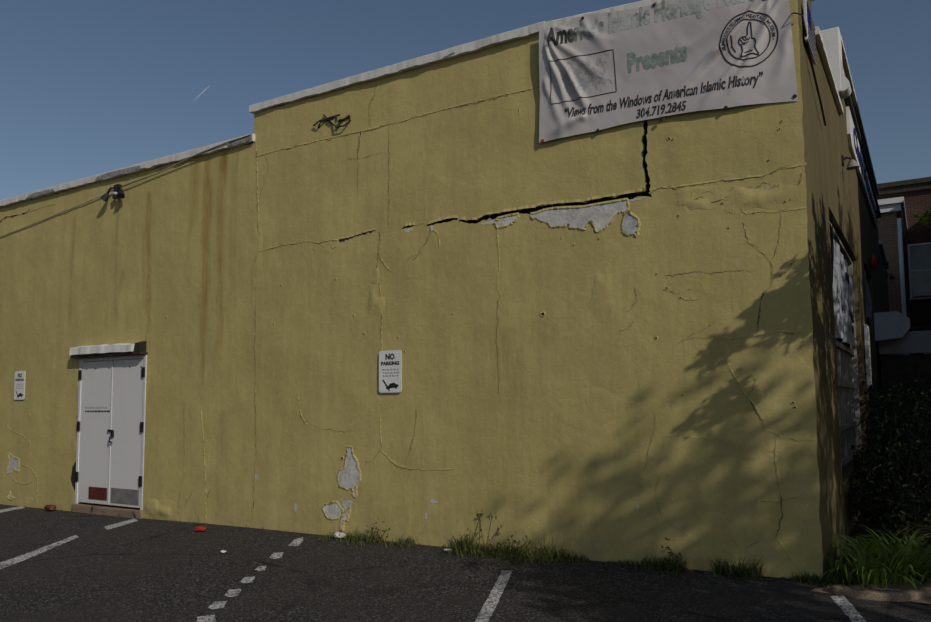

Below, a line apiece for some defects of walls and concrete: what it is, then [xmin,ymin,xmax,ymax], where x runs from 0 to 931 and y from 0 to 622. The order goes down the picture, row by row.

peeling [481,196,647,239]
crack [251,86,807,540]
peeling [322,445,362,532]